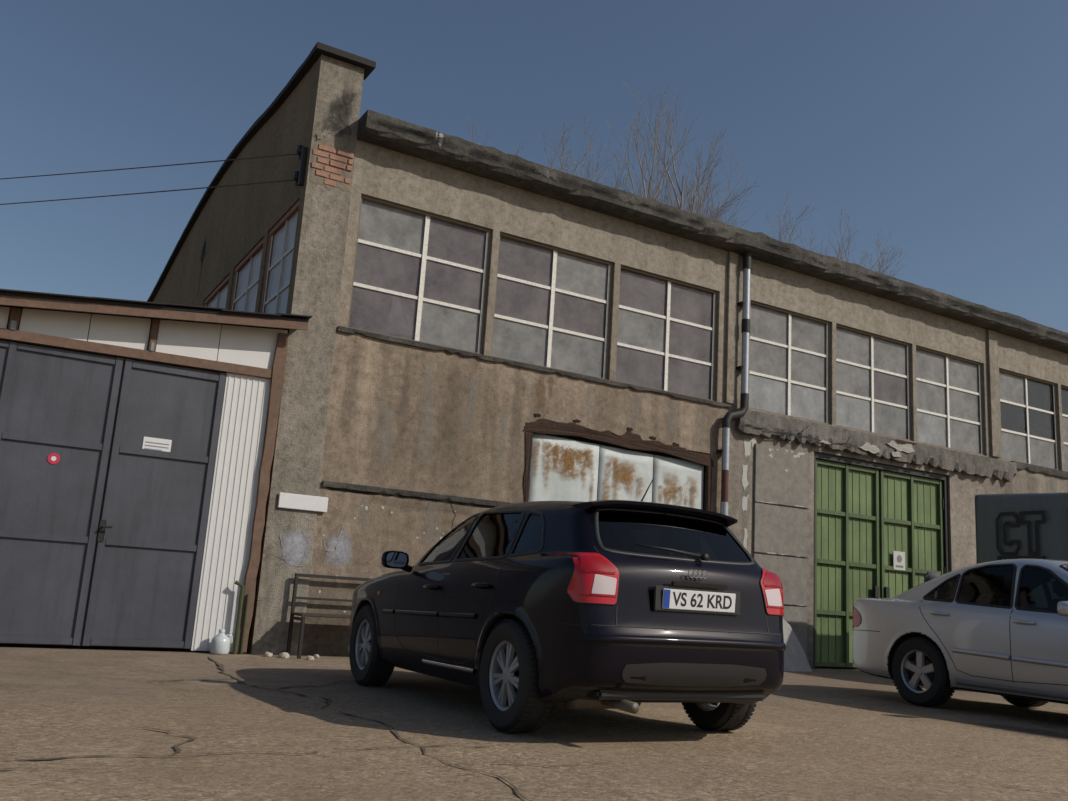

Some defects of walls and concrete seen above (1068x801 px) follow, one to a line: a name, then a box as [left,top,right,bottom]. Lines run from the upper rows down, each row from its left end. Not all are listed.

spalling [309,130,356,194]
rust [533,443,643,500]
rust [659,478,696,508]
peeling [742,438,757,511]
spalling [859,439,917,457]
crack [126,656,618,801]
crack [0,755,111,770]